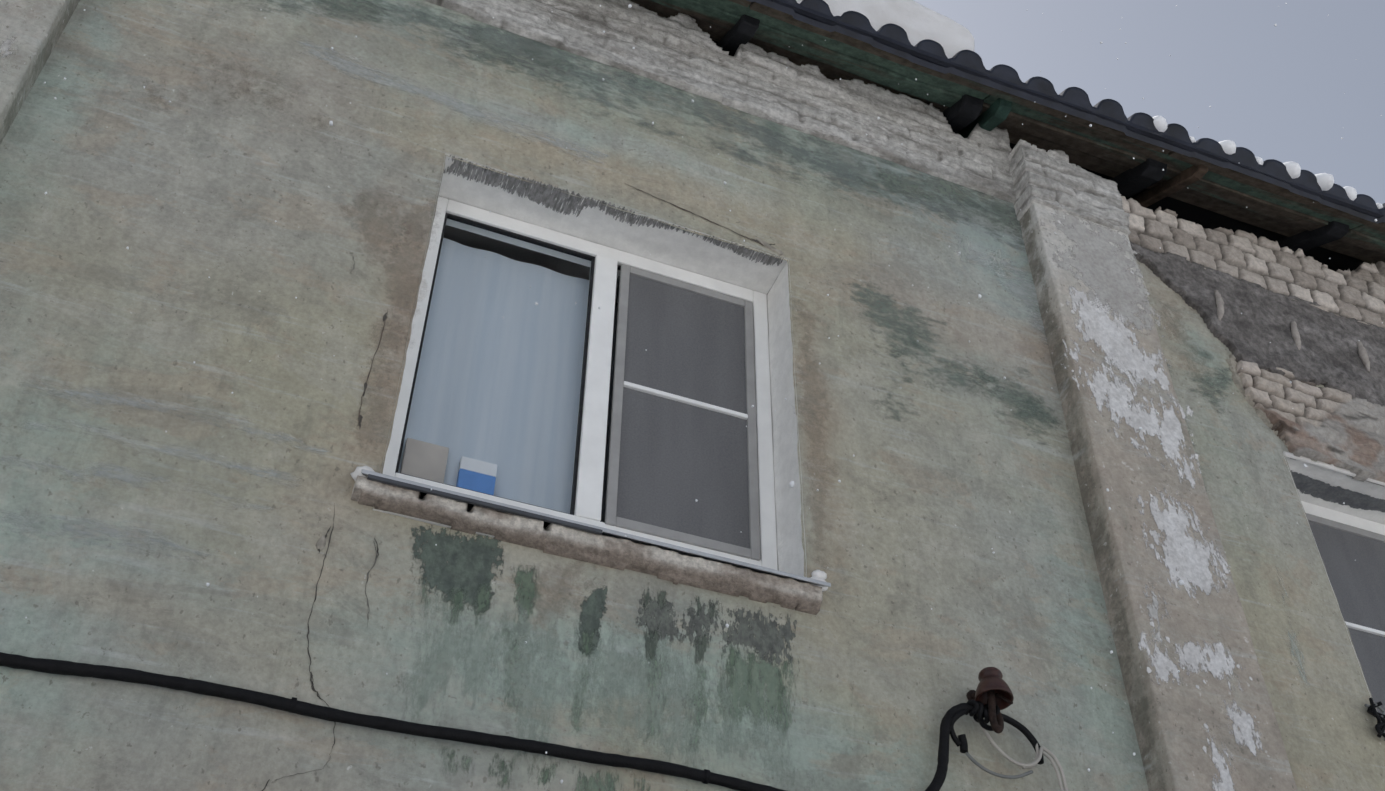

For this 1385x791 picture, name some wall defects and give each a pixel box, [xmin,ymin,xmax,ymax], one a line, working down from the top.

crack [358,309,388,429]
flaking render [1041,196,1385,791]
crack [262,503,336,791]
crack [365,538,379,626]
leakage [411,526,537,625]
leakage [578,587,607,656]
leakage [636,589,797,745]